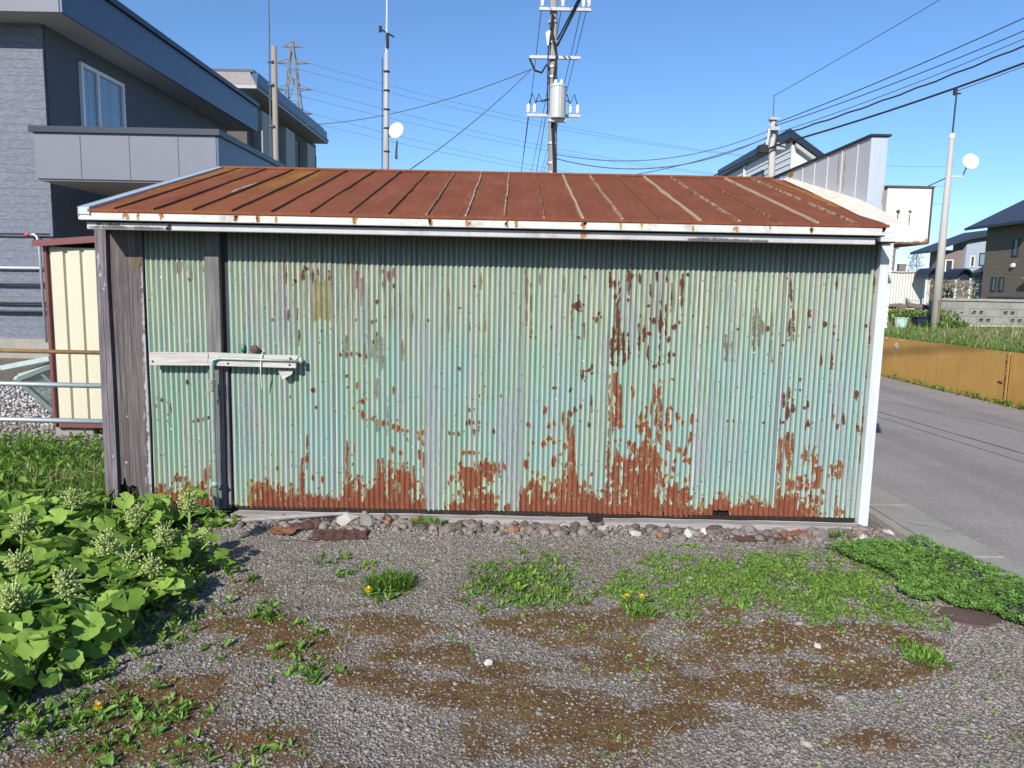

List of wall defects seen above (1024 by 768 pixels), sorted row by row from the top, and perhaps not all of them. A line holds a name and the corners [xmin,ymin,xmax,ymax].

rust [119,168,245,201]
rust [256,170,326,190]
rust [761,171,842,208]
rust [232,319,428,510]
rust [444,269,845,518]
rust [830,383,864,464]